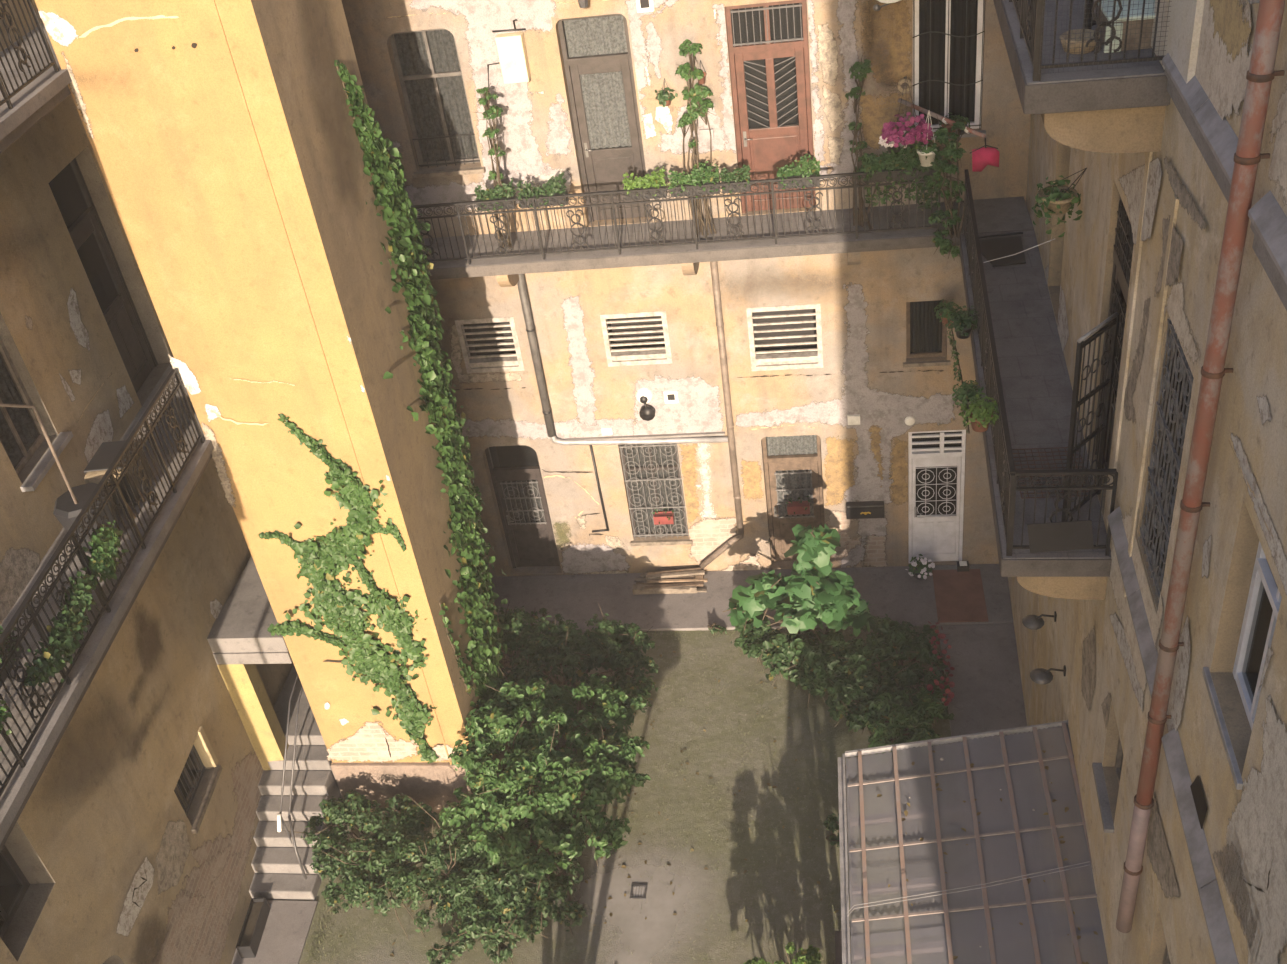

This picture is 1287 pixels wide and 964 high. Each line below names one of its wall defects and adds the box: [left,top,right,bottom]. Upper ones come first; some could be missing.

spalling [38,10,94,140]
crack [79,15,179,38]
peeling [642,106,674,139]
spalling [1268,81,1287,206]
peeling [84,385,134,464]
spalling [168,354,236,507]
crack [212,411,268,426]
crack [233,378,295,386]
peeling [824,425,908,568]
spalling [324,702,455,763]
peeling [1147,793,1180,897]
spalling [1213,648,1287,964]